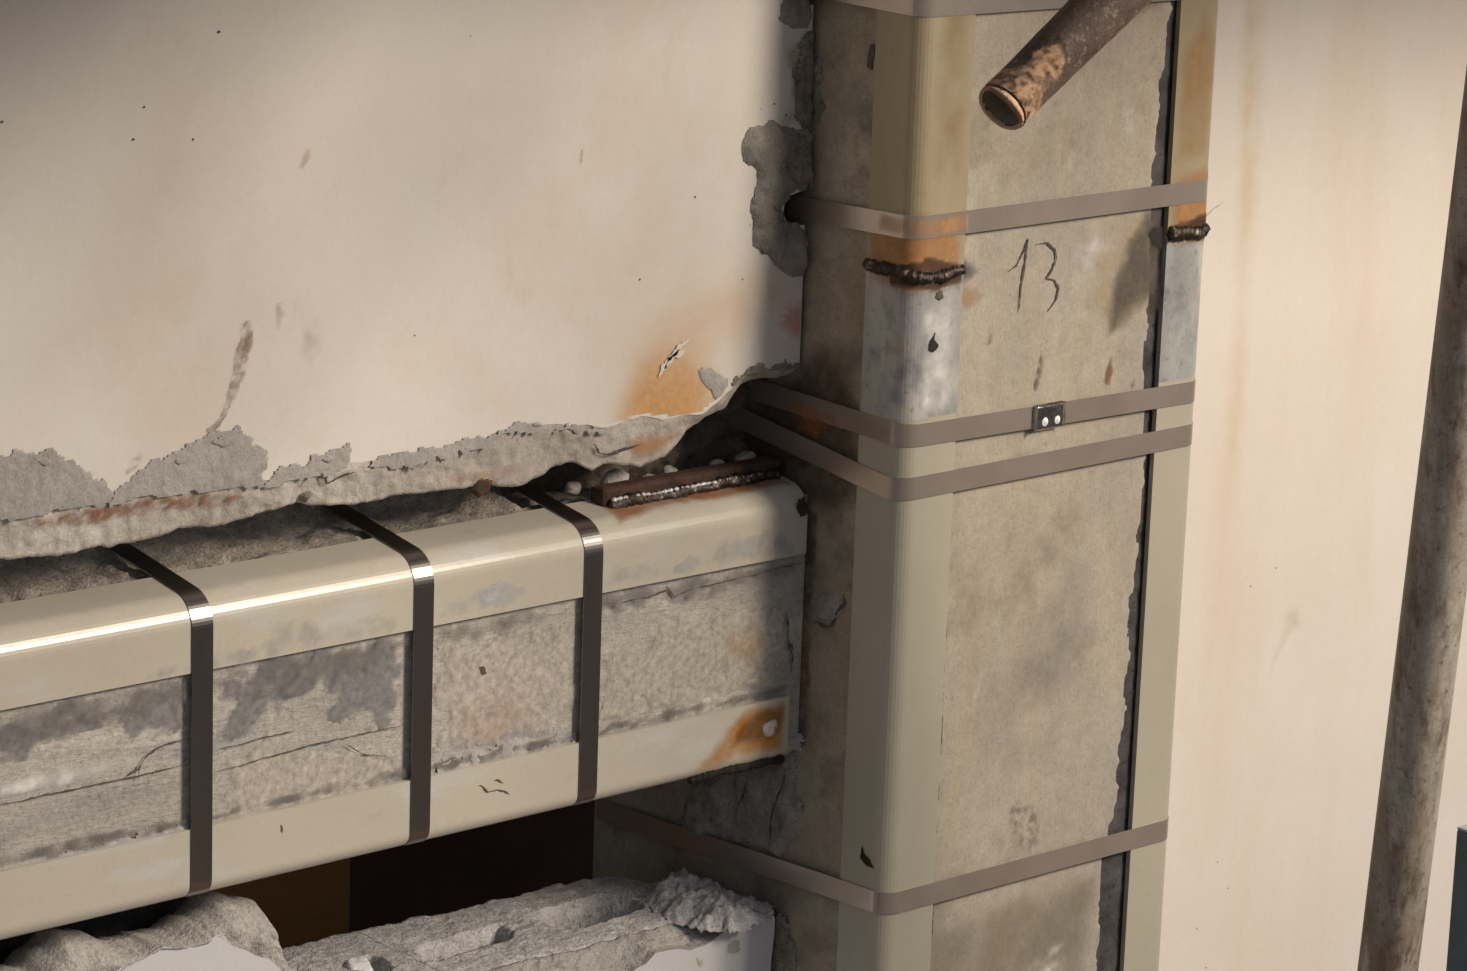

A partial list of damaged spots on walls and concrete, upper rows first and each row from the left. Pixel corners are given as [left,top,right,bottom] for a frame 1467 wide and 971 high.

spalling [760,0,814,130]
corrosion [1174,200,1207,240]
corrosion [877,218,962,290]
corrosion [658,340,689,377]
corrosion [640,395,692,416]
spalling [0,359,799,560]
corrosion [611,507,643,518]
corrosion [660,483,763,503]
corrosion [715,708,781,760]
crack [2,724,406,804]
spalling [0,891,292,971]
spalling [484,923,712,971]